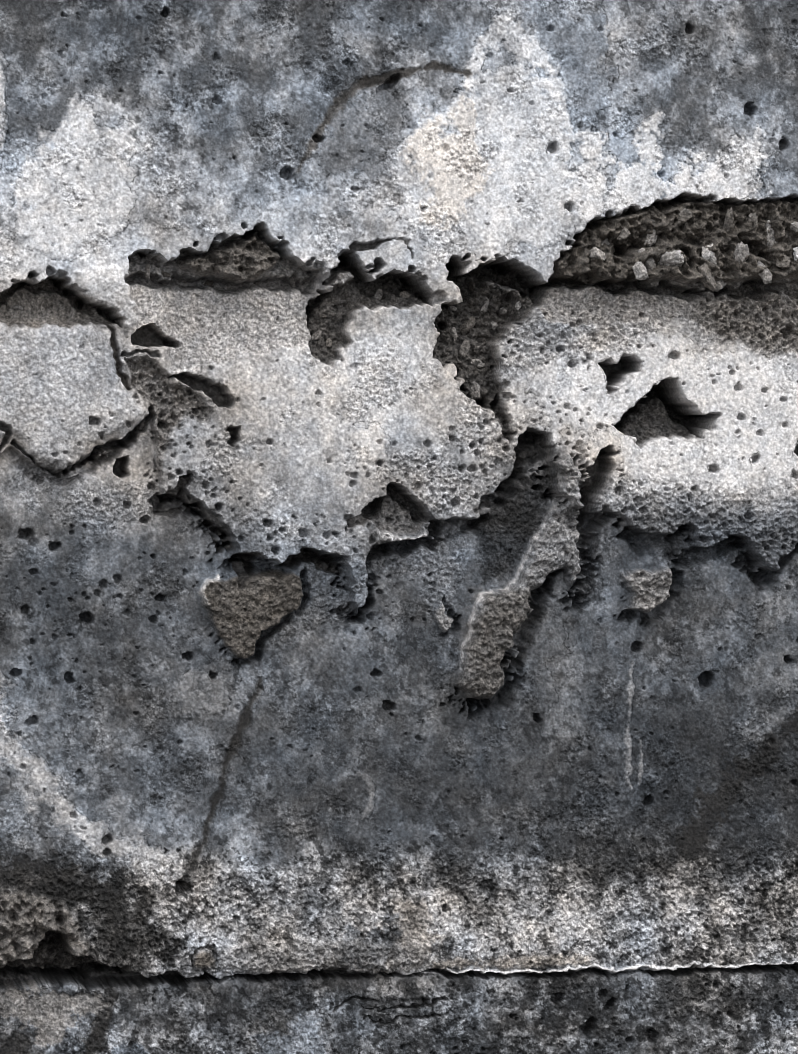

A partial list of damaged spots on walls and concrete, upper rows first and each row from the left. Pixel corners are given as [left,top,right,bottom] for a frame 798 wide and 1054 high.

spalling [0,192,798,485]
flaking render [197,545,346,659]
crack [0,959,798,1026]